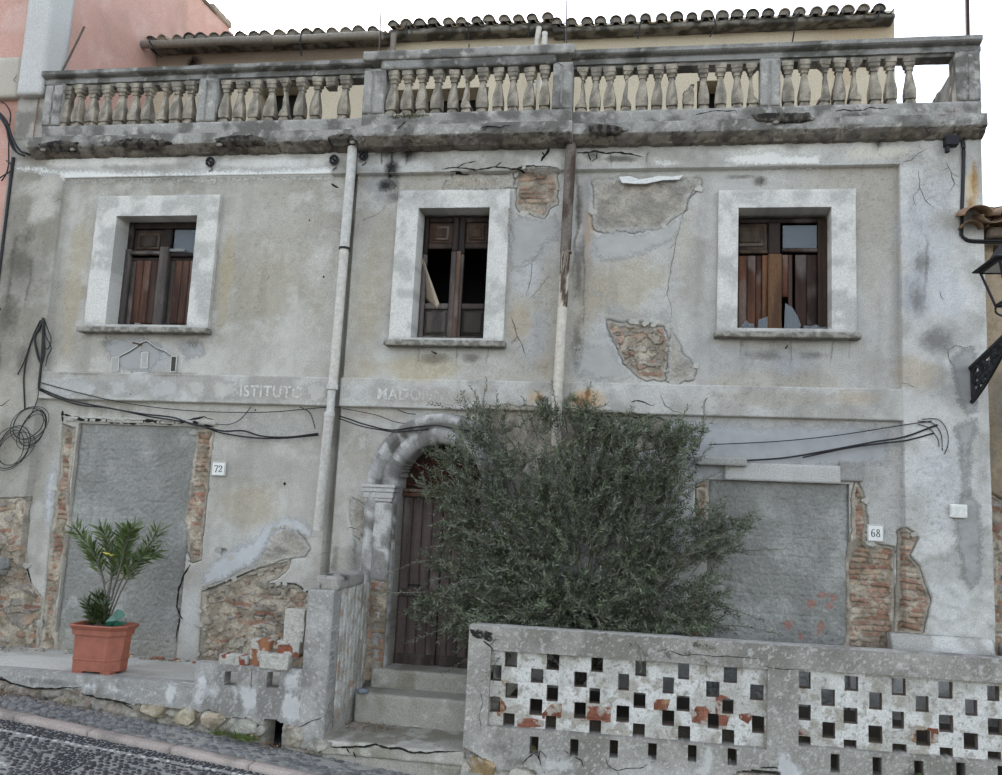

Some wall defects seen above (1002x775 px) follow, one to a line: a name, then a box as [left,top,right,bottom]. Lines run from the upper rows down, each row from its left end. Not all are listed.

crack [445,148,556,175]
spalling [443,166,561,219]
spalling [588,158,703,234]
peeling [724,149,822,170]
crack [902,149,959,208]
spalling [606,319,700,385]
spalling [0,424,78,650]
spalling [184,429,311,671]
spalling [843,482,931,649]